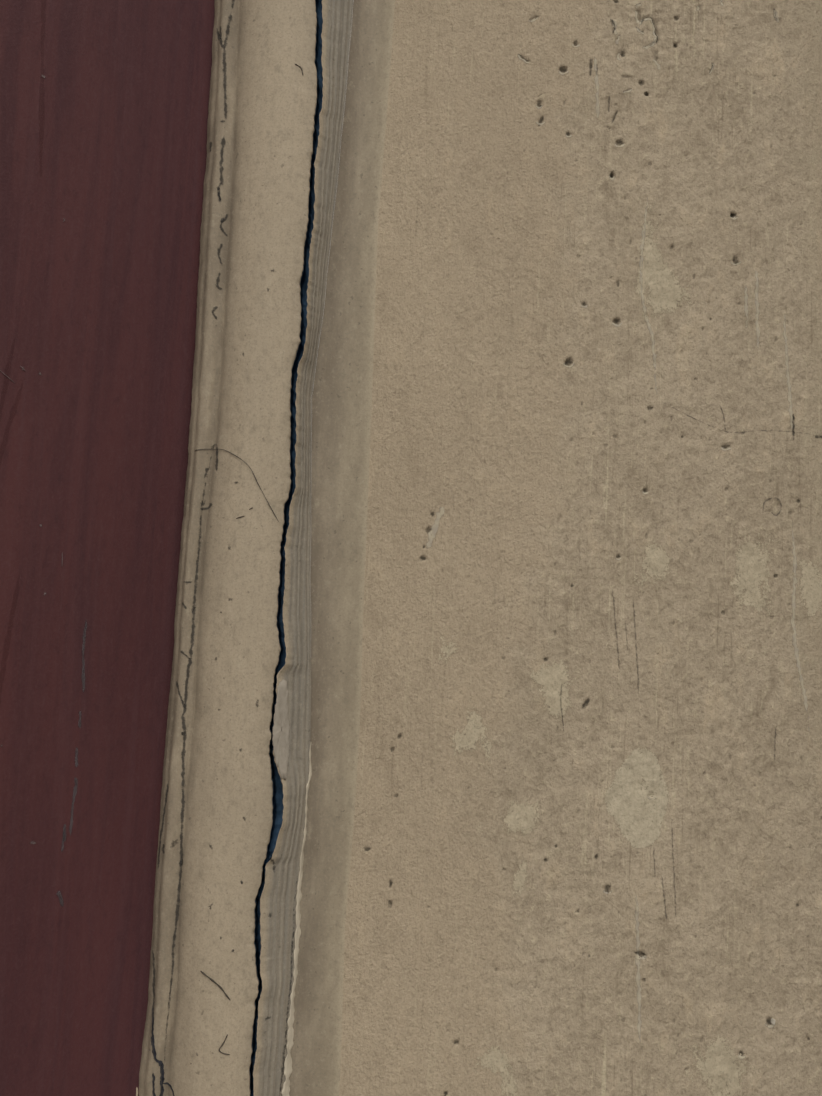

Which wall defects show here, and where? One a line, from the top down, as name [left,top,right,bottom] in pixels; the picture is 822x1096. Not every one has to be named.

crack [210,0,235,319]
crack [249,0,323,1096]